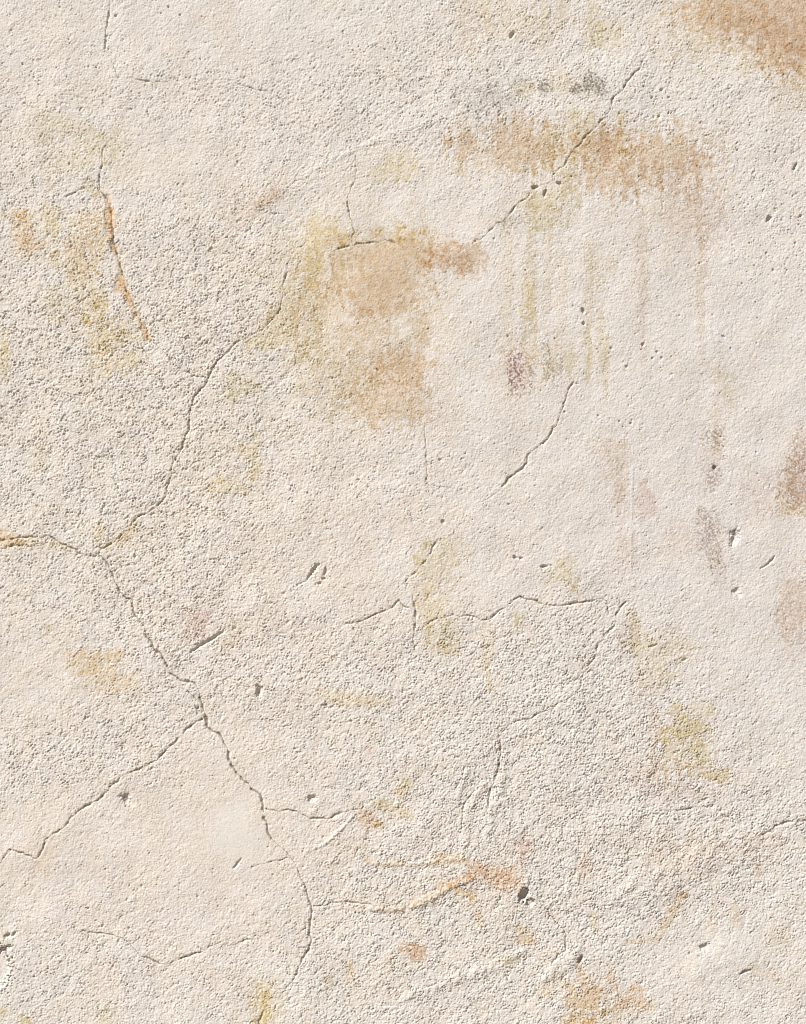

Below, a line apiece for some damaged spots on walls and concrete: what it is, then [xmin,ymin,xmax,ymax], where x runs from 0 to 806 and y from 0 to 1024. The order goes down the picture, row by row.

corrosion [3,207,145,378]
crack [331,155,395,252]
crack [474,62,642,242]
crack [482,381,574,502]
crack [0,143,372,993]
crack [346,538,629,833]